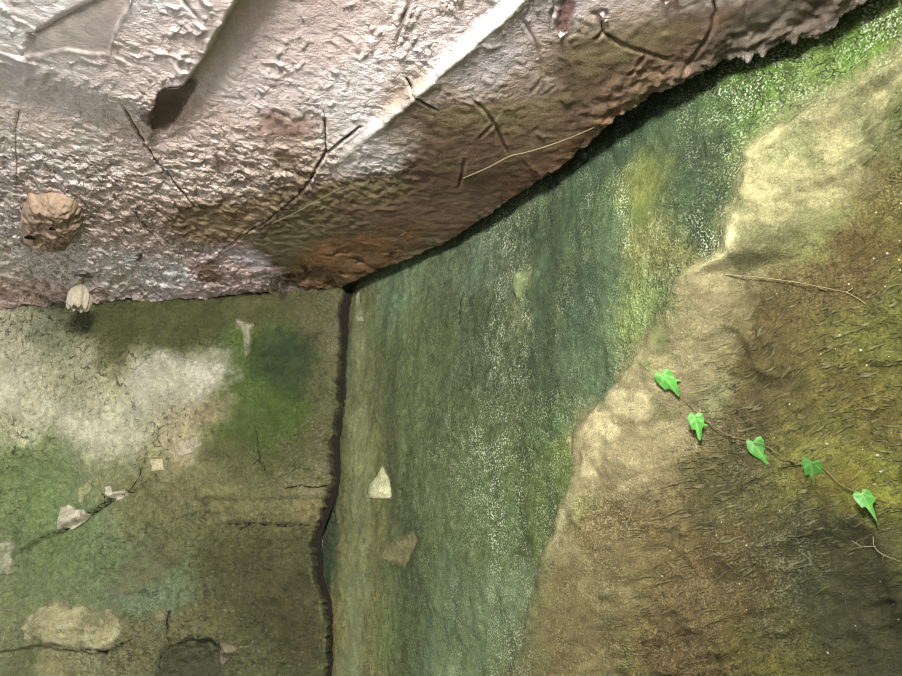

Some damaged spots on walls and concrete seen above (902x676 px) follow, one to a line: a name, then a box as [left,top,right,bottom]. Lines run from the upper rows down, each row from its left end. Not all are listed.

peeling [25,0,131,57]
spalling [139,79,195,130]
crack [122,104,195,206]
crack [219,114,361,254]
corrosion [501,120,609,203]
corrosion [295,224,423,289]
water stain [138,359,221,406]
crack [40,395,160,538]
crack [226,292,352,676]
water stain [342,315,370,676]
spalling [0,542,12,574]
spalling [21,601,121,652]